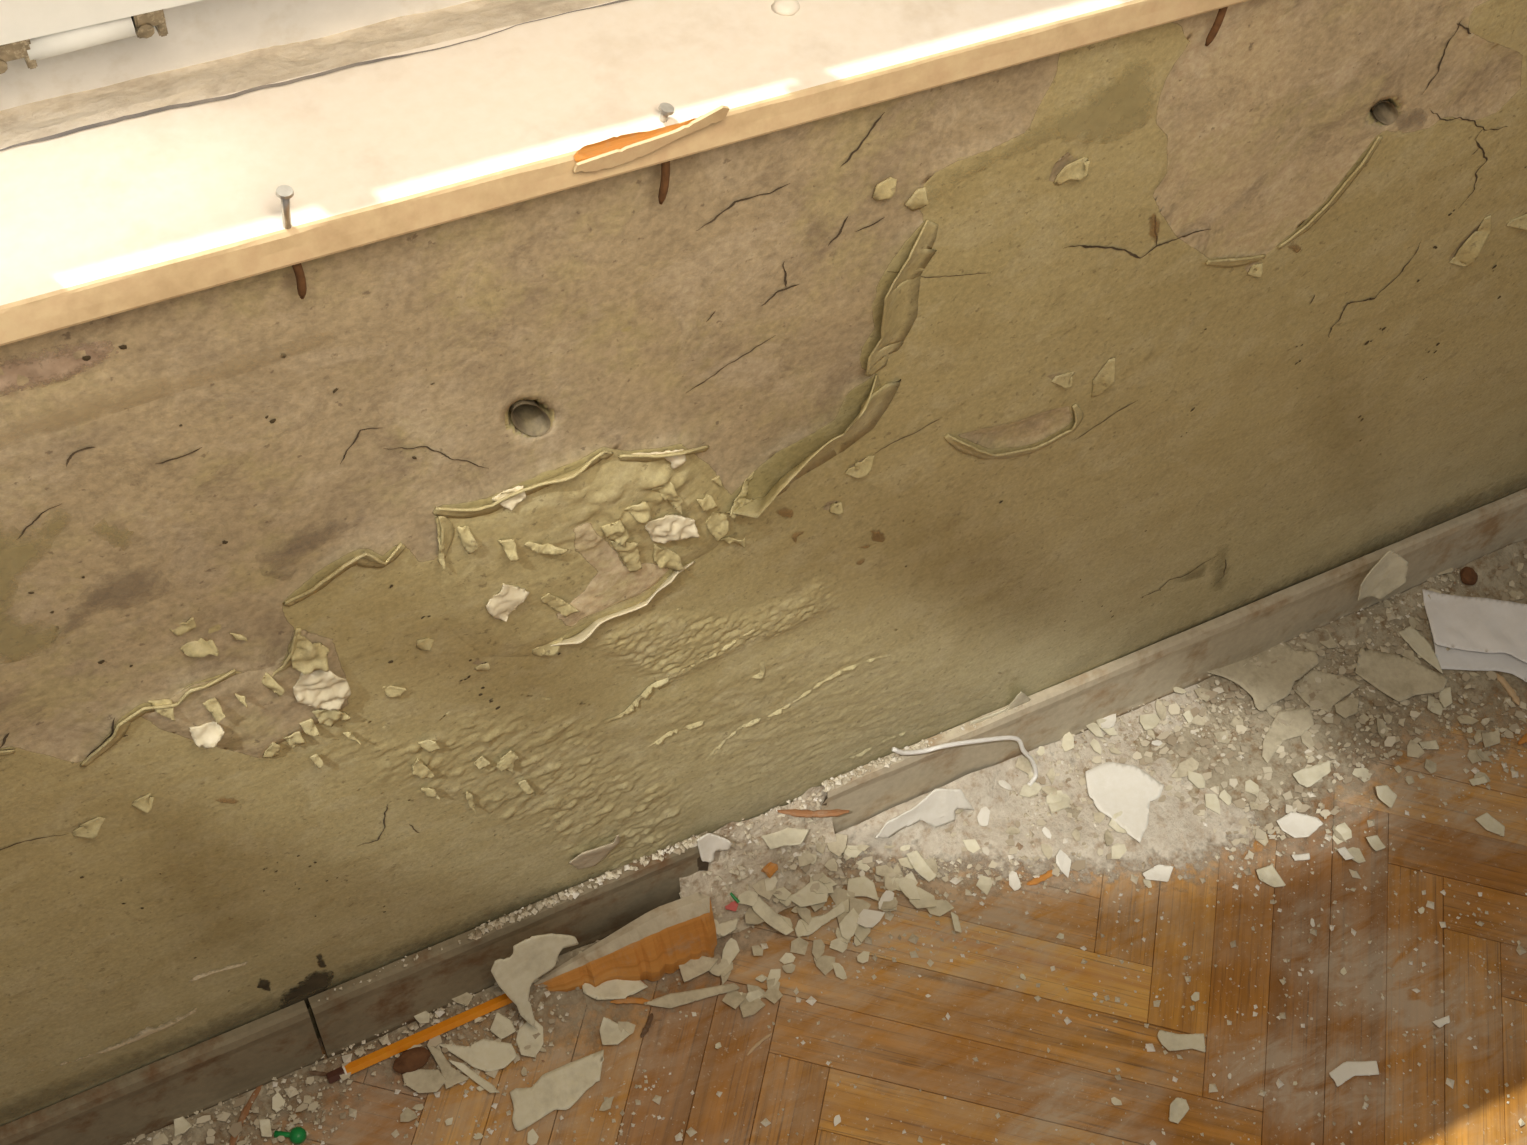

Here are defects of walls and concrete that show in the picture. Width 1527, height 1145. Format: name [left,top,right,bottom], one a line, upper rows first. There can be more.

peeling [1153,0,1527,278]
crack [1423,21,1508,201]
crack [828,217,883,246]
crack [1309,243,1420,337]
peeling [0,53,1060,769]
peeling [944,357,1115,460]
crack [0,833,68,850]
peeling [132,793,154,814]
peeling [412,739,440,800]
peeling [474,750,535,795]